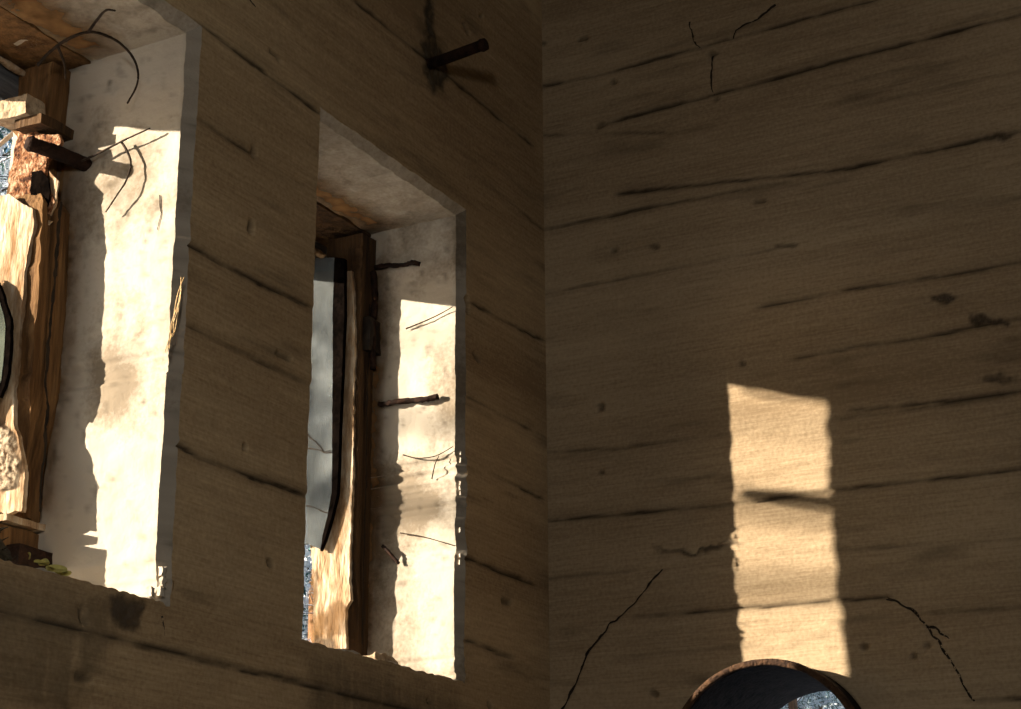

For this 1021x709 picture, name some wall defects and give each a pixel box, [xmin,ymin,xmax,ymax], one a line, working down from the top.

crack [561,569,663,709]
crack [886,597,975,701]